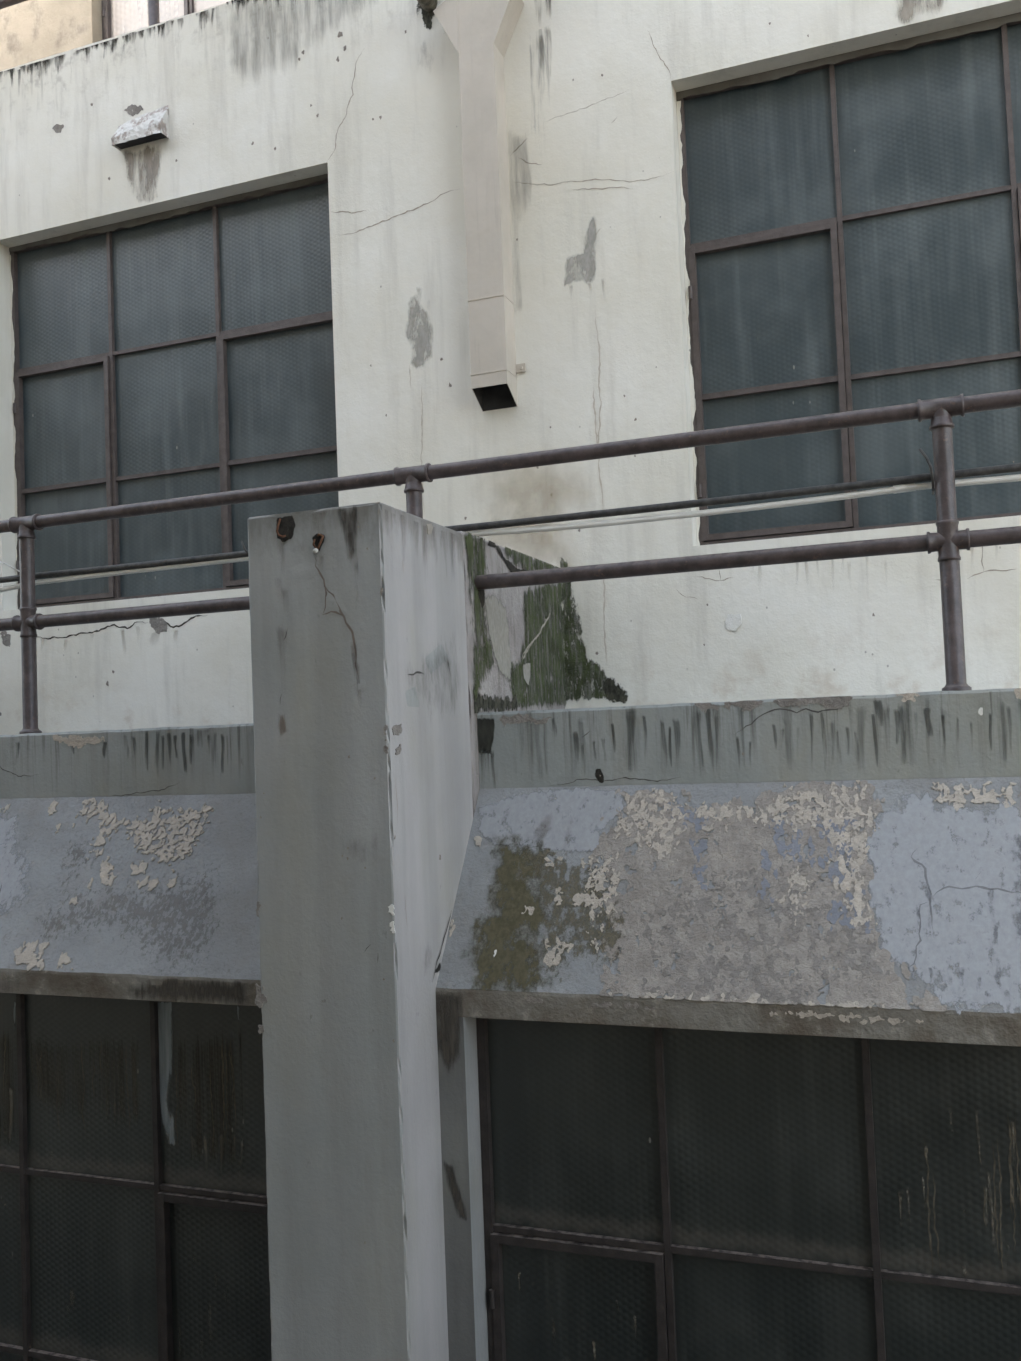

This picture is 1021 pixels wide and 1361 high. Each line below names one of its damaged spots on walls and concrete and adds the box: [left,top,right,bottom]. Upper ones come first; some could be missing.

water stain [0,0,248,81]
water stain [124,147,159,198]
crack [331,190,452,235]
spalling [565,218,596,284]
crack [511,93,659,190]
crack [41,615,202,640]
water stain [474,693,517,765]
water stain [603,677,678,760]
peeling [931,781,1021,811]
peeling [48,798,214,905]
peeling [554,780,947,1025]
crack [908,850,1021,968]